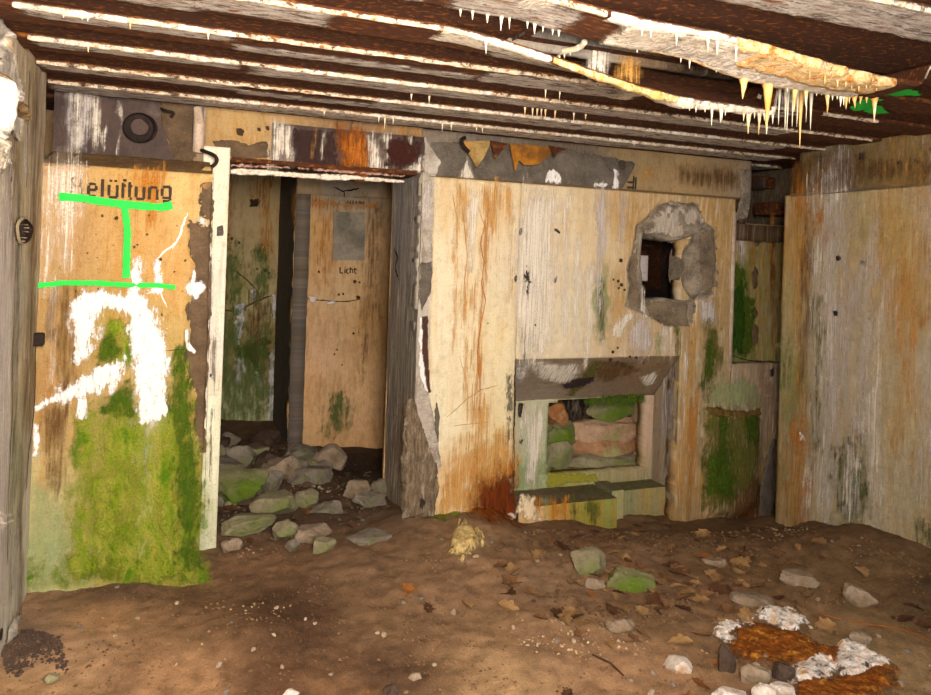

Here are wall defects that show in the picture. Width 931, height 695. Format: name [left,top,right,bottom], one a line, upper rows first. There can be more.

leakage [0,150,23,629]
spalling [0,19,27,187]
rust [292,121,372,182]
rust [384,135,422,169]
leakage [12,0,931,523]
rust [441,177,521,526]
spalling [401,137,635,519]
spalling [613,201,719,326]